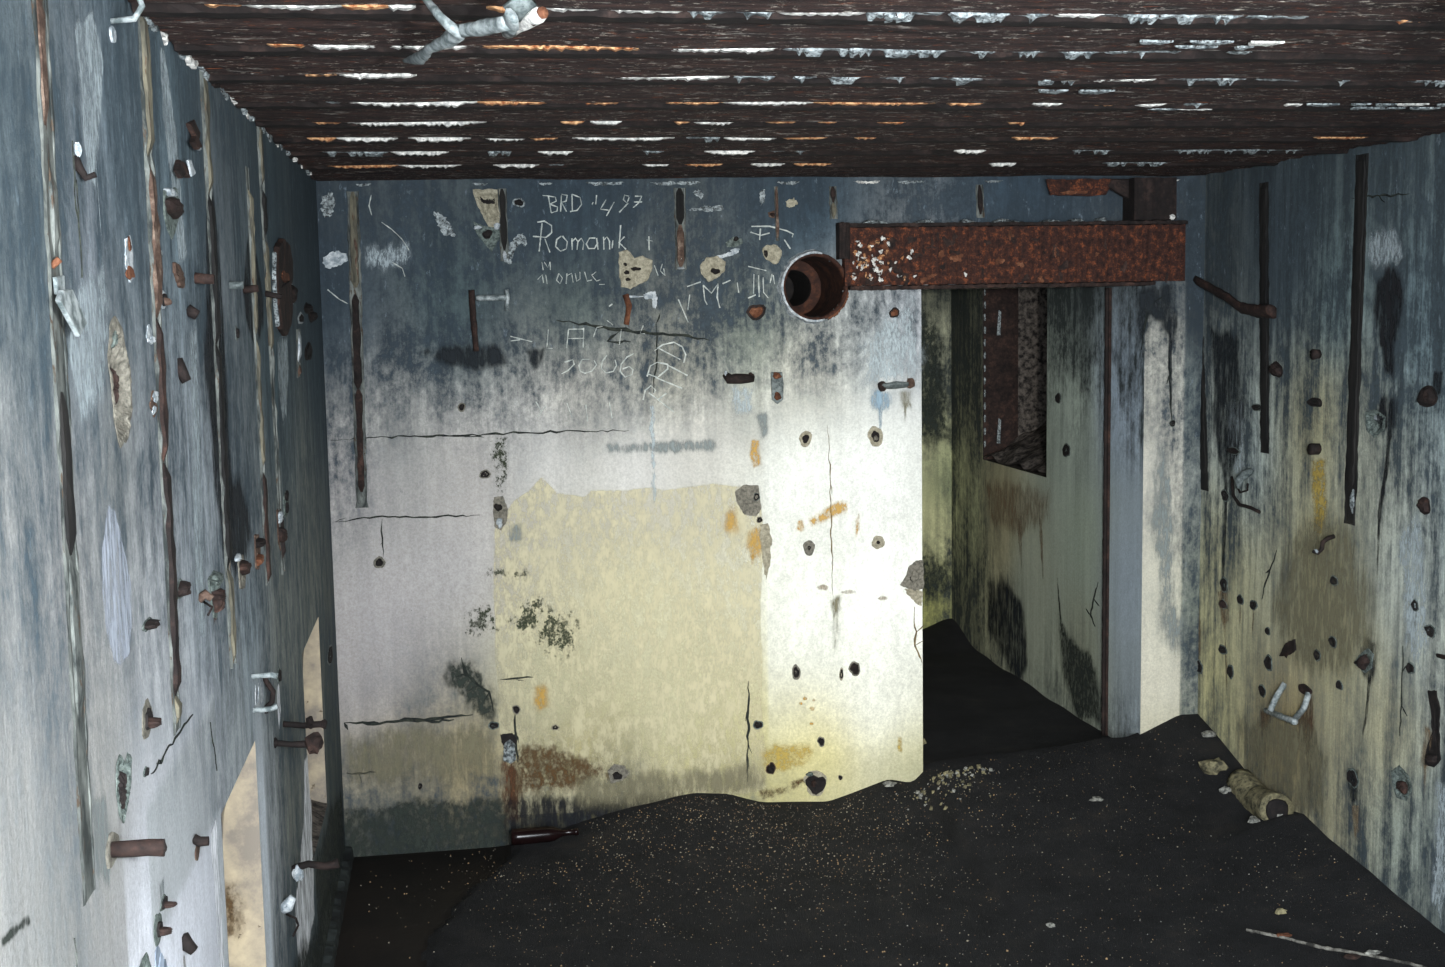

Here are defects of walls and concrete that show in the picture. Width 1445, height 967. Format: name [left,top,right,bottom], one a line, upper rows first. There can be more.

rust [865,236,964,286]
spalling [107,316,133,448]
rust [149,390,159,417]
damp [869,307,951,440]
spalling [900,560,925,606]
mould [922,556,952,595]
damp [295,406,810,967]
crack [151,714,217,774]
spalling [116,752,132,824]
peeling [139,945,167,967]